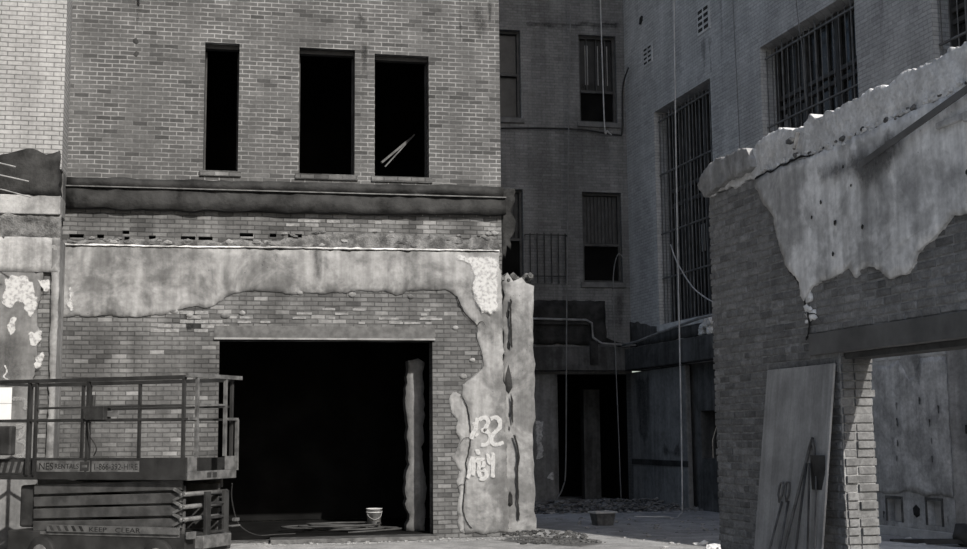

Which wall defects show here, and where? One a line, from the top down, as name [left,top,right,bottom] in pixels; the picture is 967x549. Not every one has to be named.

peeling [755,77,967,324]
peeling [0,479,38,549]
peeling [0,213,509,535]
crack [456,296,486,528]
crack [507,299,515,348]
crack [510,395,520,520]